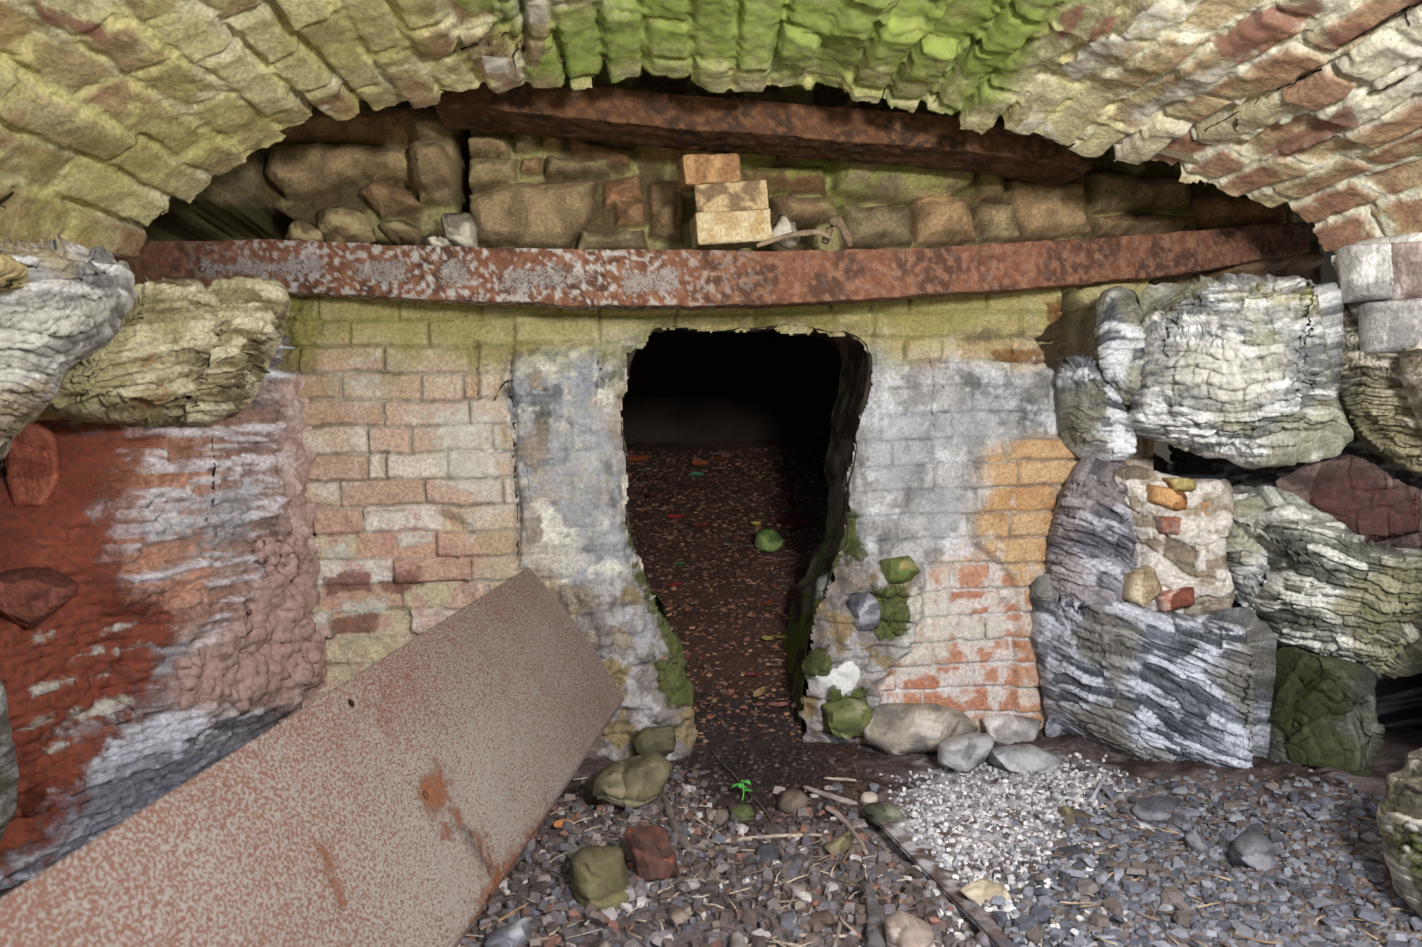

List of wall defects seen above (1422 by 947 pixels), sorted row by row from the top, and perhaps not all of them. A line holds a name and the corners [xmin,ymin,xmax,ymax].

water stain [423,0,612,79]
water stain [954,8,1042,111]